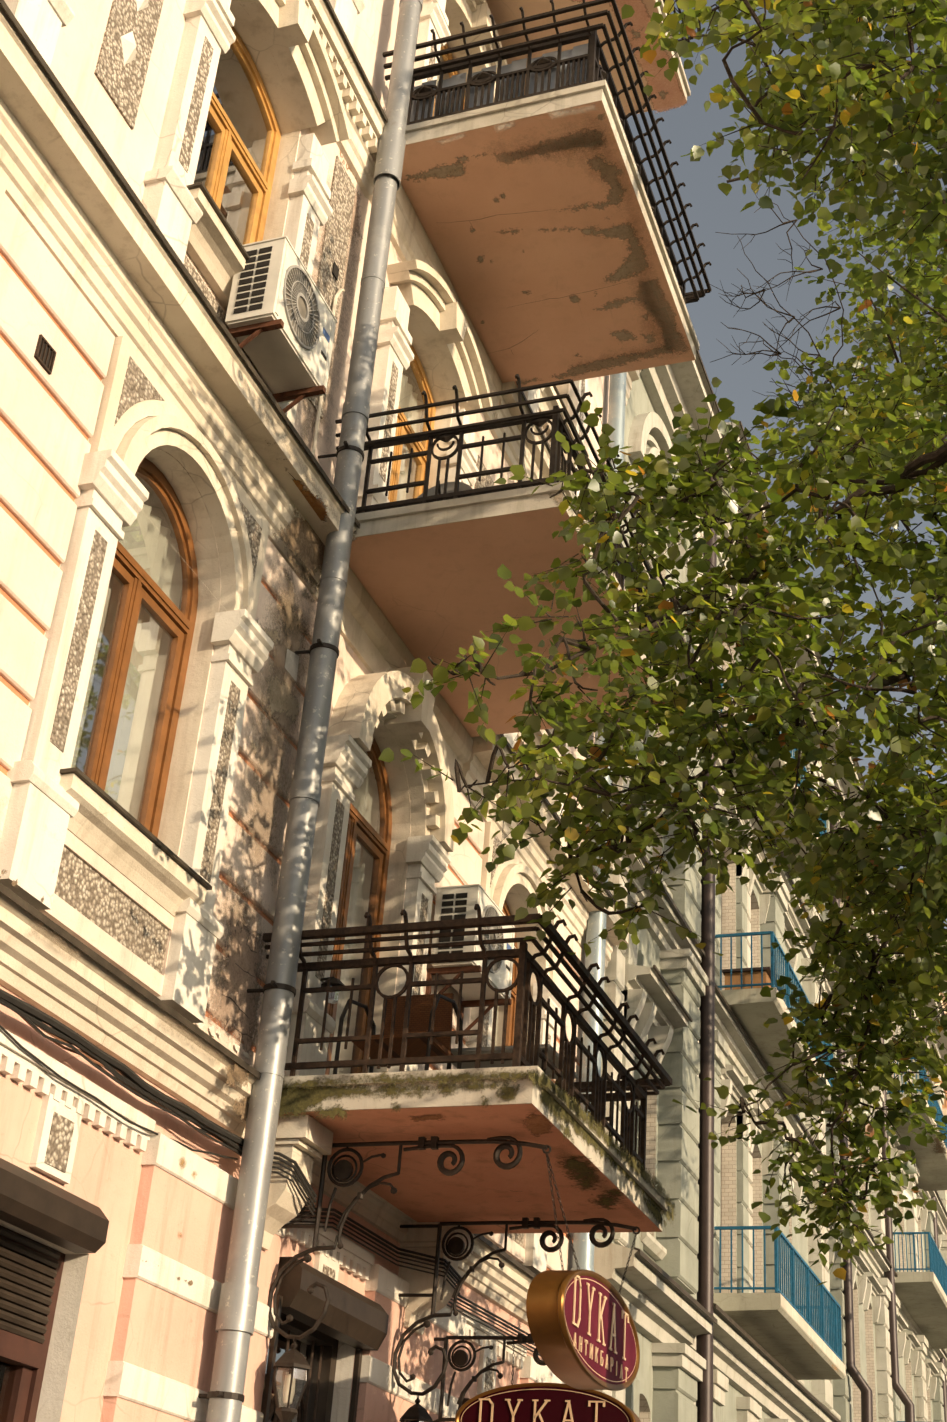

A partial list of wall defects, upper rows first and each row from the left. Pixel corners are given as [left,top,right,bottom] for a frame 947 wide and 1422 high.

peeling [406,115,687,380]
water stain [248,567,321,862]
water stain [279,1070,675,1227]